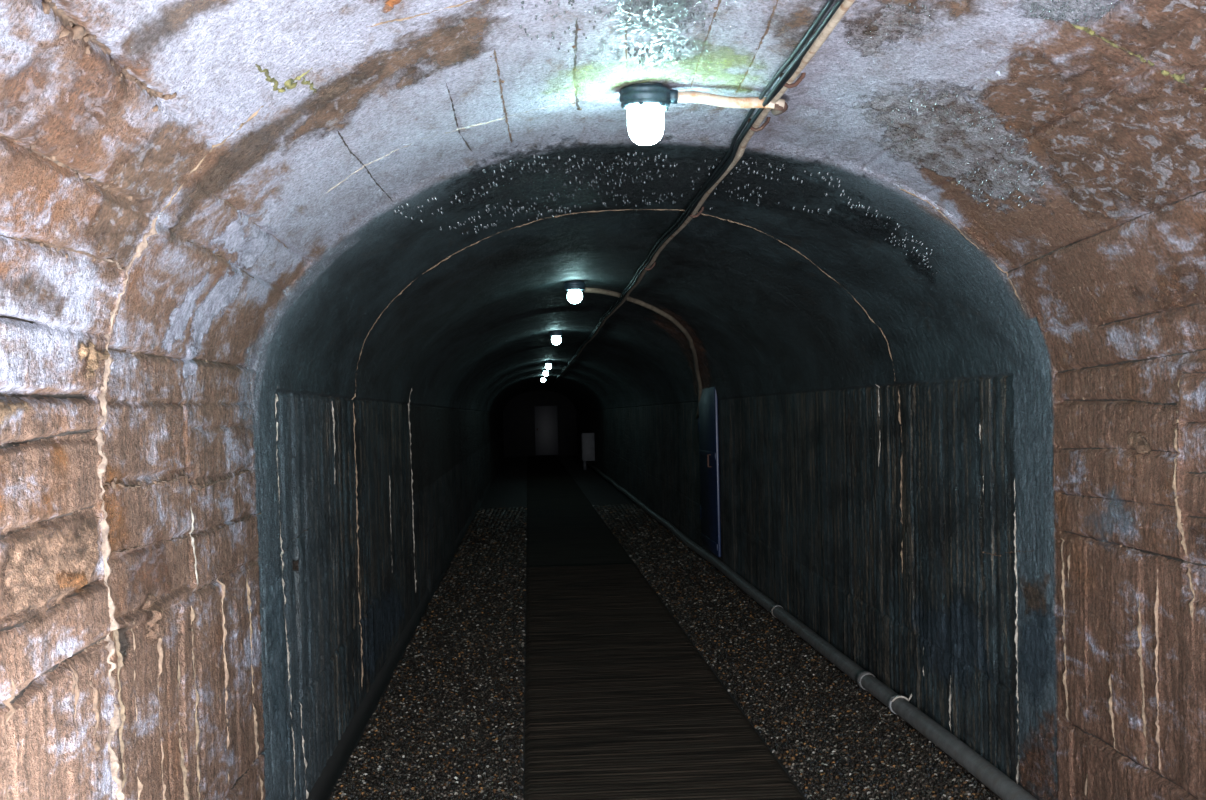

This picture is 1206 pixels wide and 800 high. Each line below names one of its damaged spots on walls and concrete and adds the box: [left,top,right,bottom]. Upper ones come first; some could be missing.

damp [124,0,231,61]
damp [844,2,937,57]
crack [1072,24,1206,90]
damp [854,79,1061,214]
crack [900,189,1206,310]
crack [1099,300,1205,326]
crack [0,64,317,800]
crack [1058,349,1206,568]